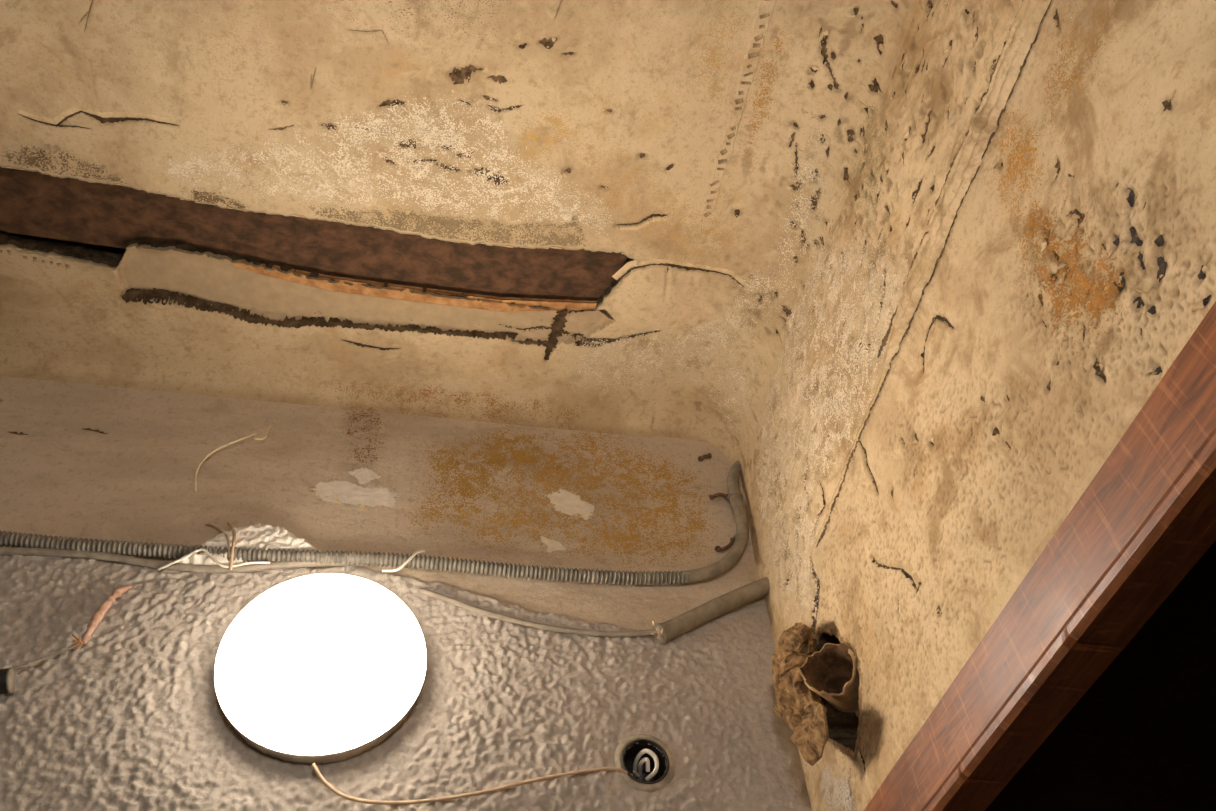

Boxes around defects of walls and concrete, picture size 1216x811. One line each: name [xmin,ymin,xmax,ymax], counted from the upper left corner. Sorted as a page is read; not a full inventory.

peeling [848,7,885,55]
crack [19,106,179,129]
peeling [1162,90,1176,111]
corrosion [984,0,1143,365]
crack [616,214,667,231]
crack [612,259,746,287]
flaking render [1102,183,1167,315]
crack [122,288,660,361]
crack [783,0,1052,632]
peeling [1093,358,1106,383]
peeling [0,27,952,811]
leakage [397,420,722,571]